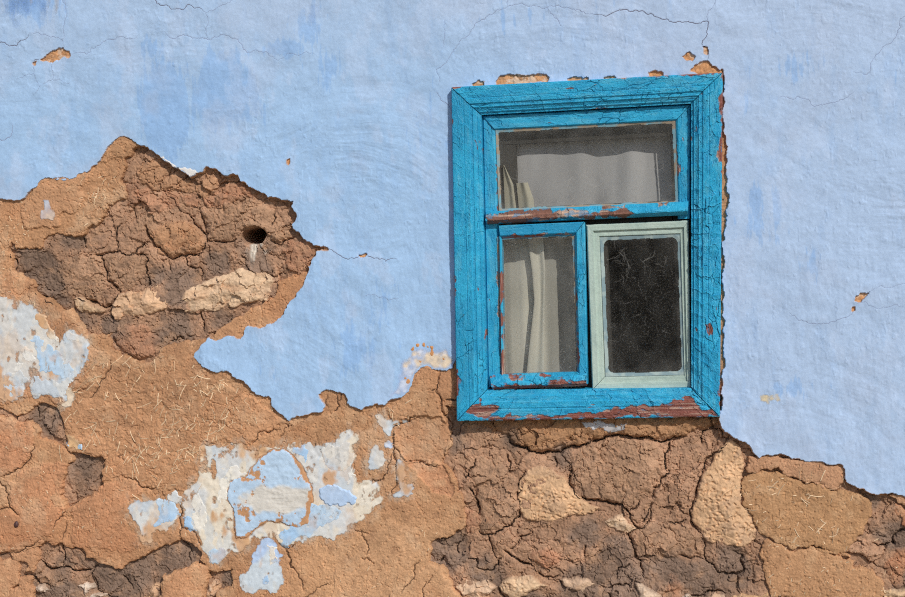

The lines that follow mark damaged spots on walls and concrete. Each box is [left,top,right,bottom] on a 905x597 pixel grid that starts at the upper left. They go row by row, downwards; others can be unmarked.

flaking render [34,48,71,66]
crack [0,0,138,91]
crack [436,0,716,109]
spalling [0,123,905,597]
crack [431,375,456,441]
crack [0,444,35,513]
crack [372,417,441,493]
crack [1,512,67,555]
crack [280,544,329,596]